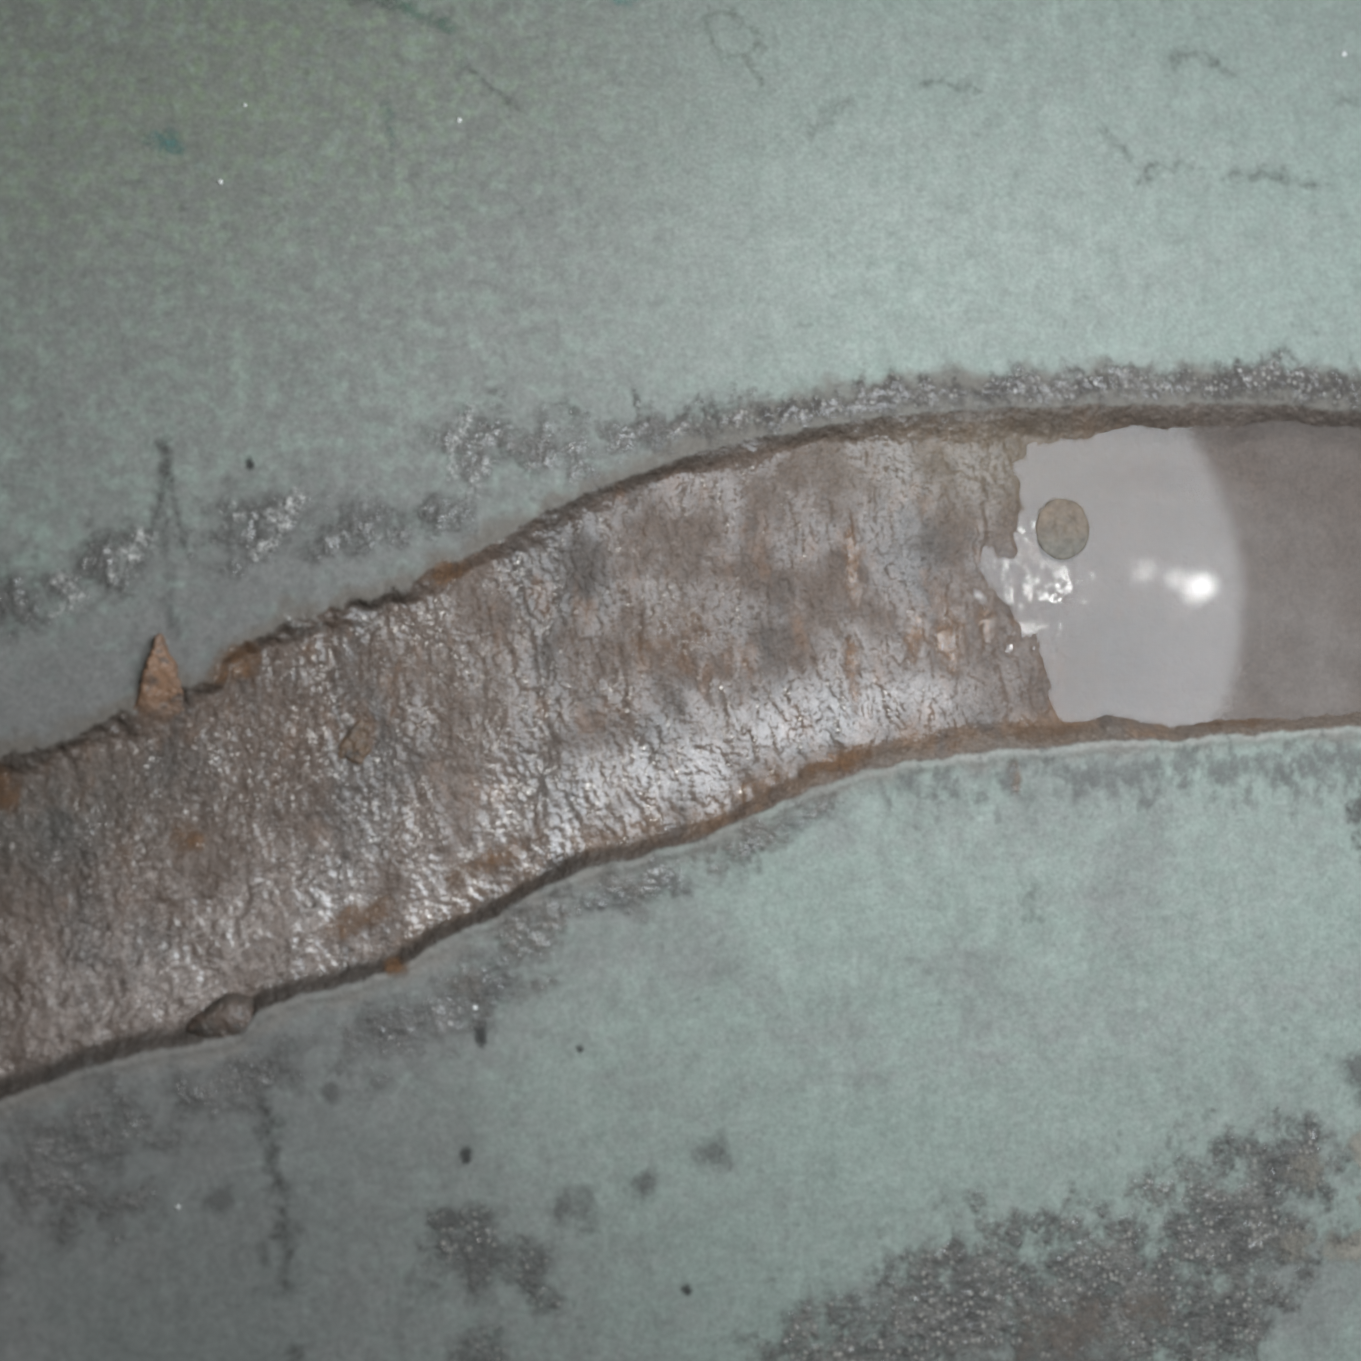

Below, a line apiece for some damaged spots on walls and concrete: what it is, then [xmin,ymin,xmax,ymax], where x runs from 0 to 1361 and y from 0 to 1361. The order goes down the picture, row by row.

corrosion [845,525,862,607]
corrosion [904,594,996,674]
corrosion [133,633,185,737]
corrosion [728,768,784,803]
corrosion [446,842,518,888]
damp [419,1206,560,1309]